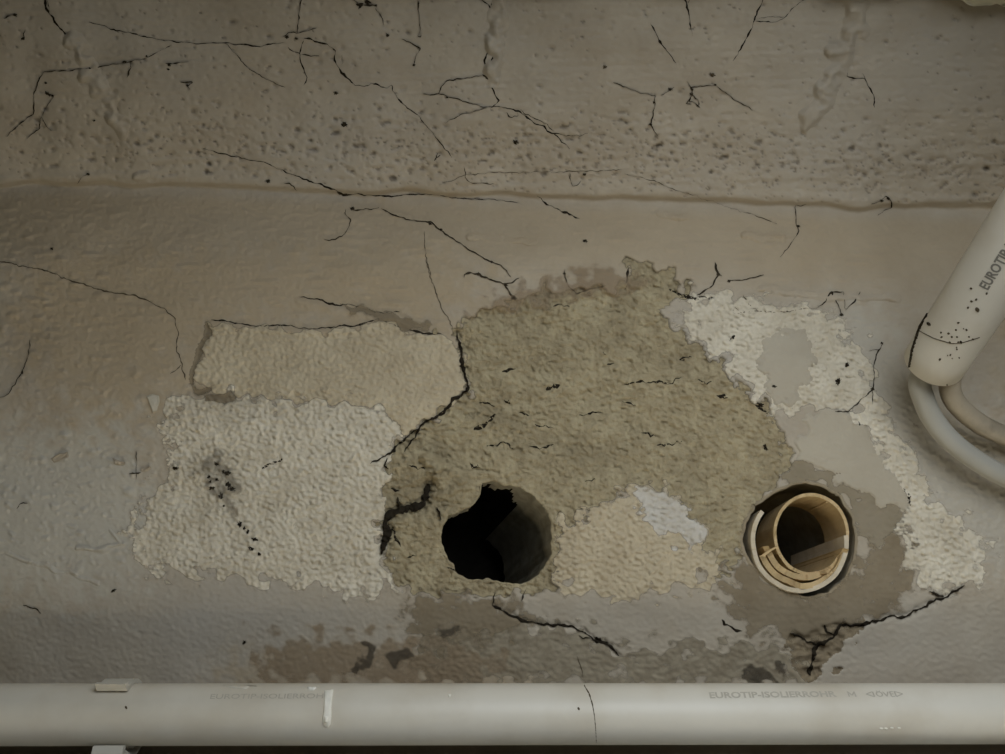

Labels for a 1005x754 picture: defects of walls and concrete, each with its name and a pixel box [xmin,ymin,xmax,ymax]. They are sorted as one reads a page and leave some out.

crack [44,0,66,34]
crack [733,0,803,61]
crack [90,22,777,224]
crack [847,73,875,107]
crack [669,289,713,301]
crack [734,295,815,314]
peeling [189,322,236,403]
flaking render [373,257,795,599]
crack [492,590,619,656]
spalling [784,616,865,683]
crack [790,586,964,675]